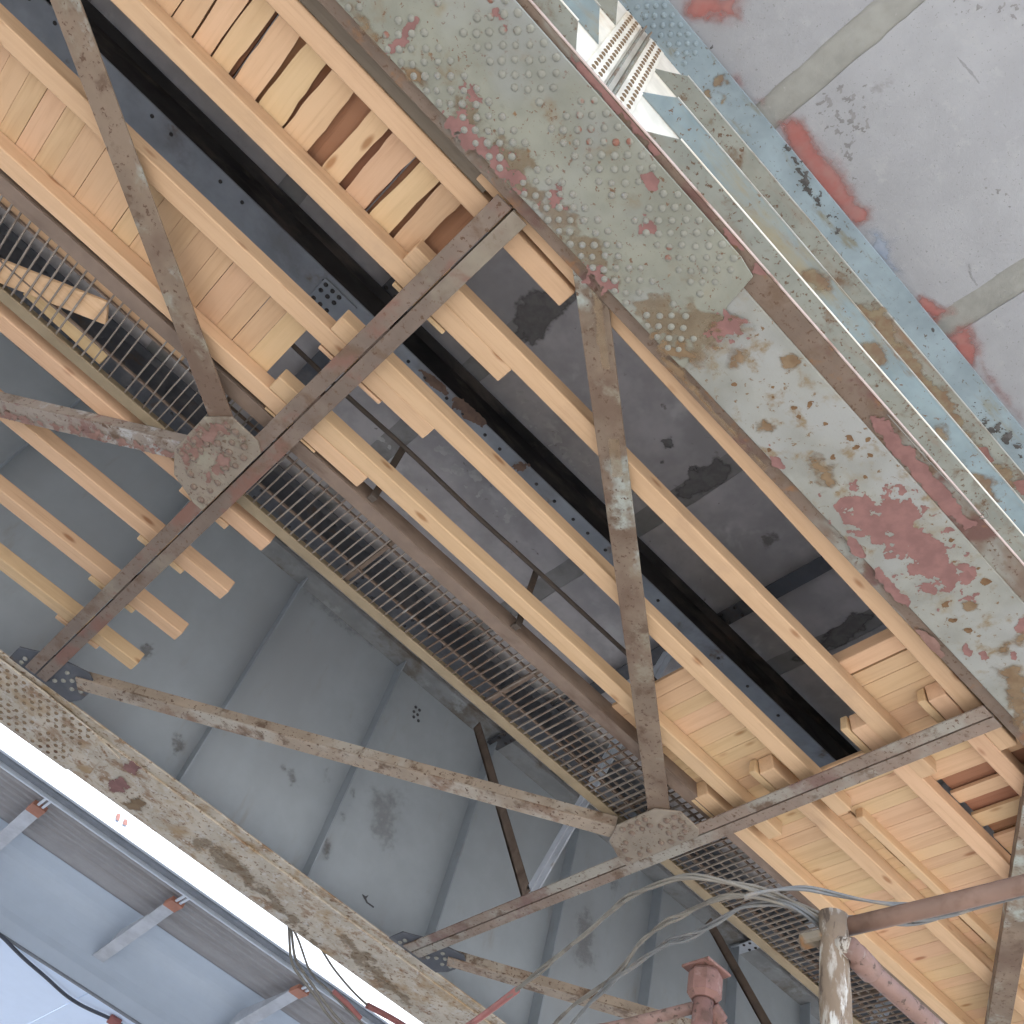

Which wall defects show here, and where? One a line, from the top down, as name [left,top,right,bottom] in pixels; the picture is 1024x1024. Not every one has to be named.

peeling [386,16,420,54]
peeling [442,82,527,195]
peeling [537,183,568,210]
rust [802,269,832,291]
leakage [513,291,576,346]
rust [857,303,981,448]
leakage [676,458,731,499]
rust [972,463,1015,502]
peeling [828,416,980,612]
leakage [821,612,872,649]
peeling [962,643,989,660]